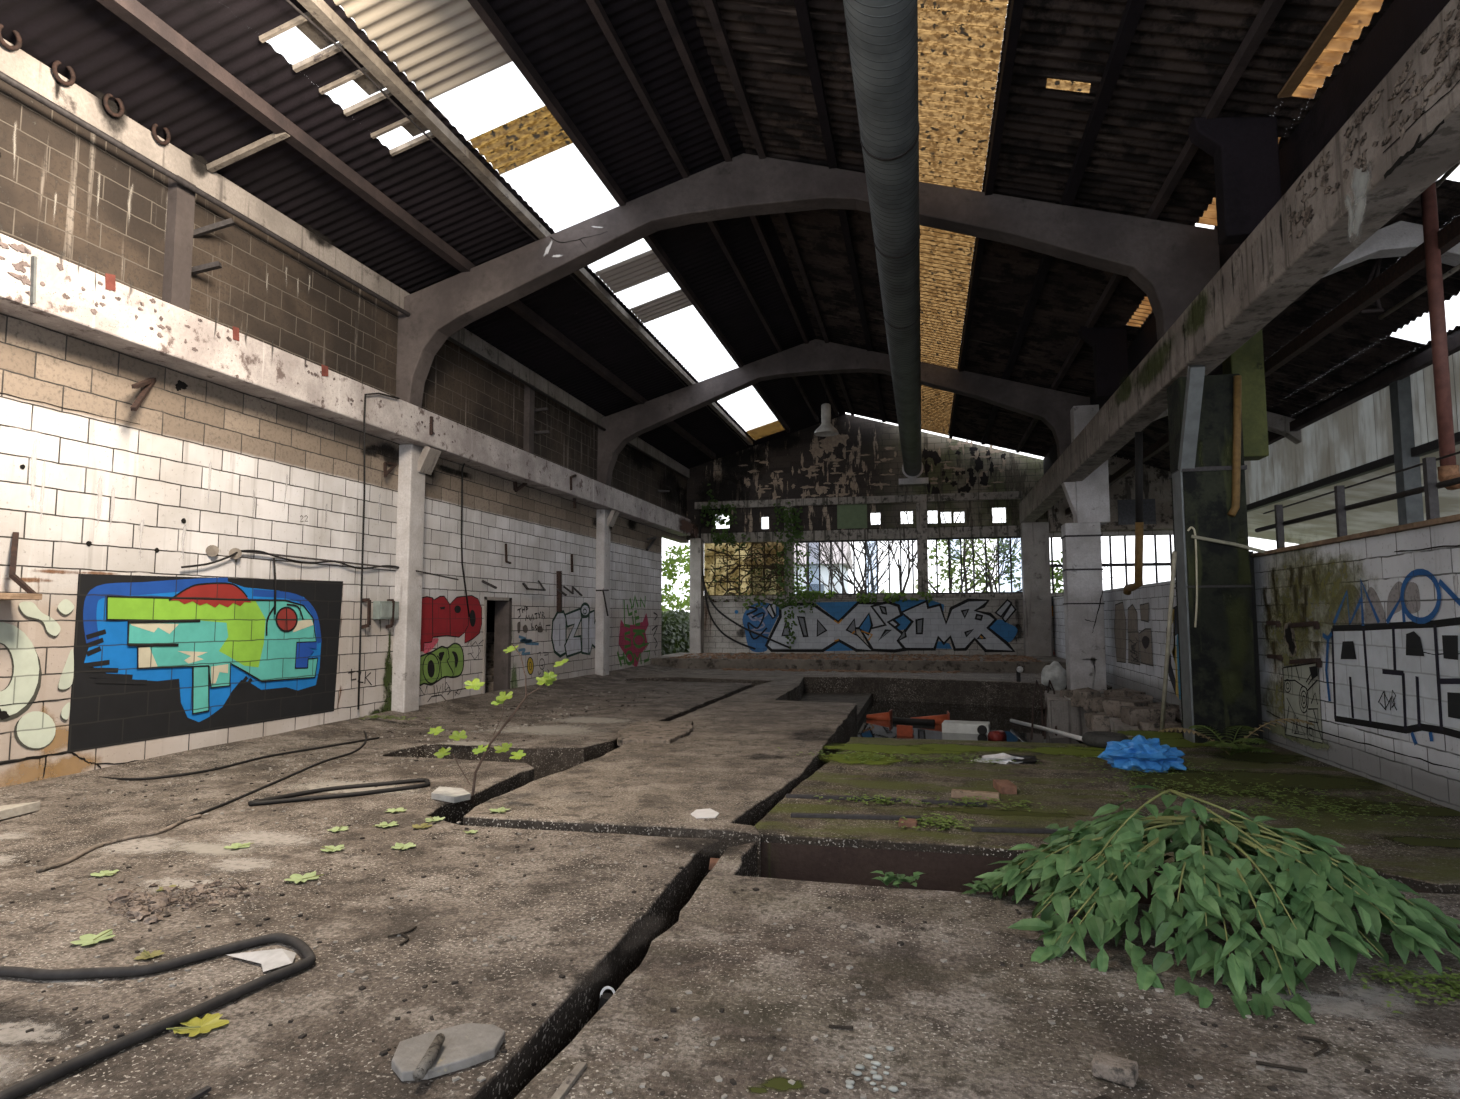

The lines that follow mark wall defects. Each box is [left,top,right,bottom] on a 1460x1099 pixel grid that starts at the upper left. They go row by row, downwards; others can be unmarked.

peeling [0,242,46,296]
peeling [63,281,121,315]
peeling [135,298,203,351]
peeling [738,434,897,500]
peeling [922,438,1006,494]
damp [1263,565,1317,662]